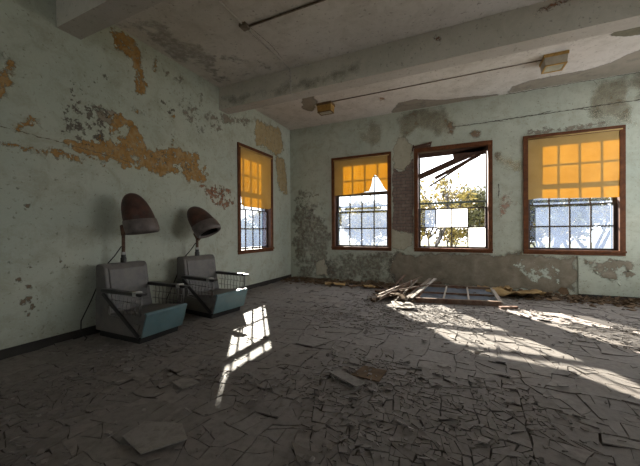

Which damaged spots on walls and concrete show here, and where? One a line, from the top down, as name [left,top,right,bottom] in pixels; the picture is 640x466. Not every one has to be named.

peeling [2,79,208,183]
peeling [109,26,148,95]
peeling [161,100,287,195]
spalling [393,137,432,172]
damp [392,94,497,135]
damp [508,50,640,117]
damp [292,191,398,283]
peeling [513,259,563,284]
peeling [585,258,635,286]